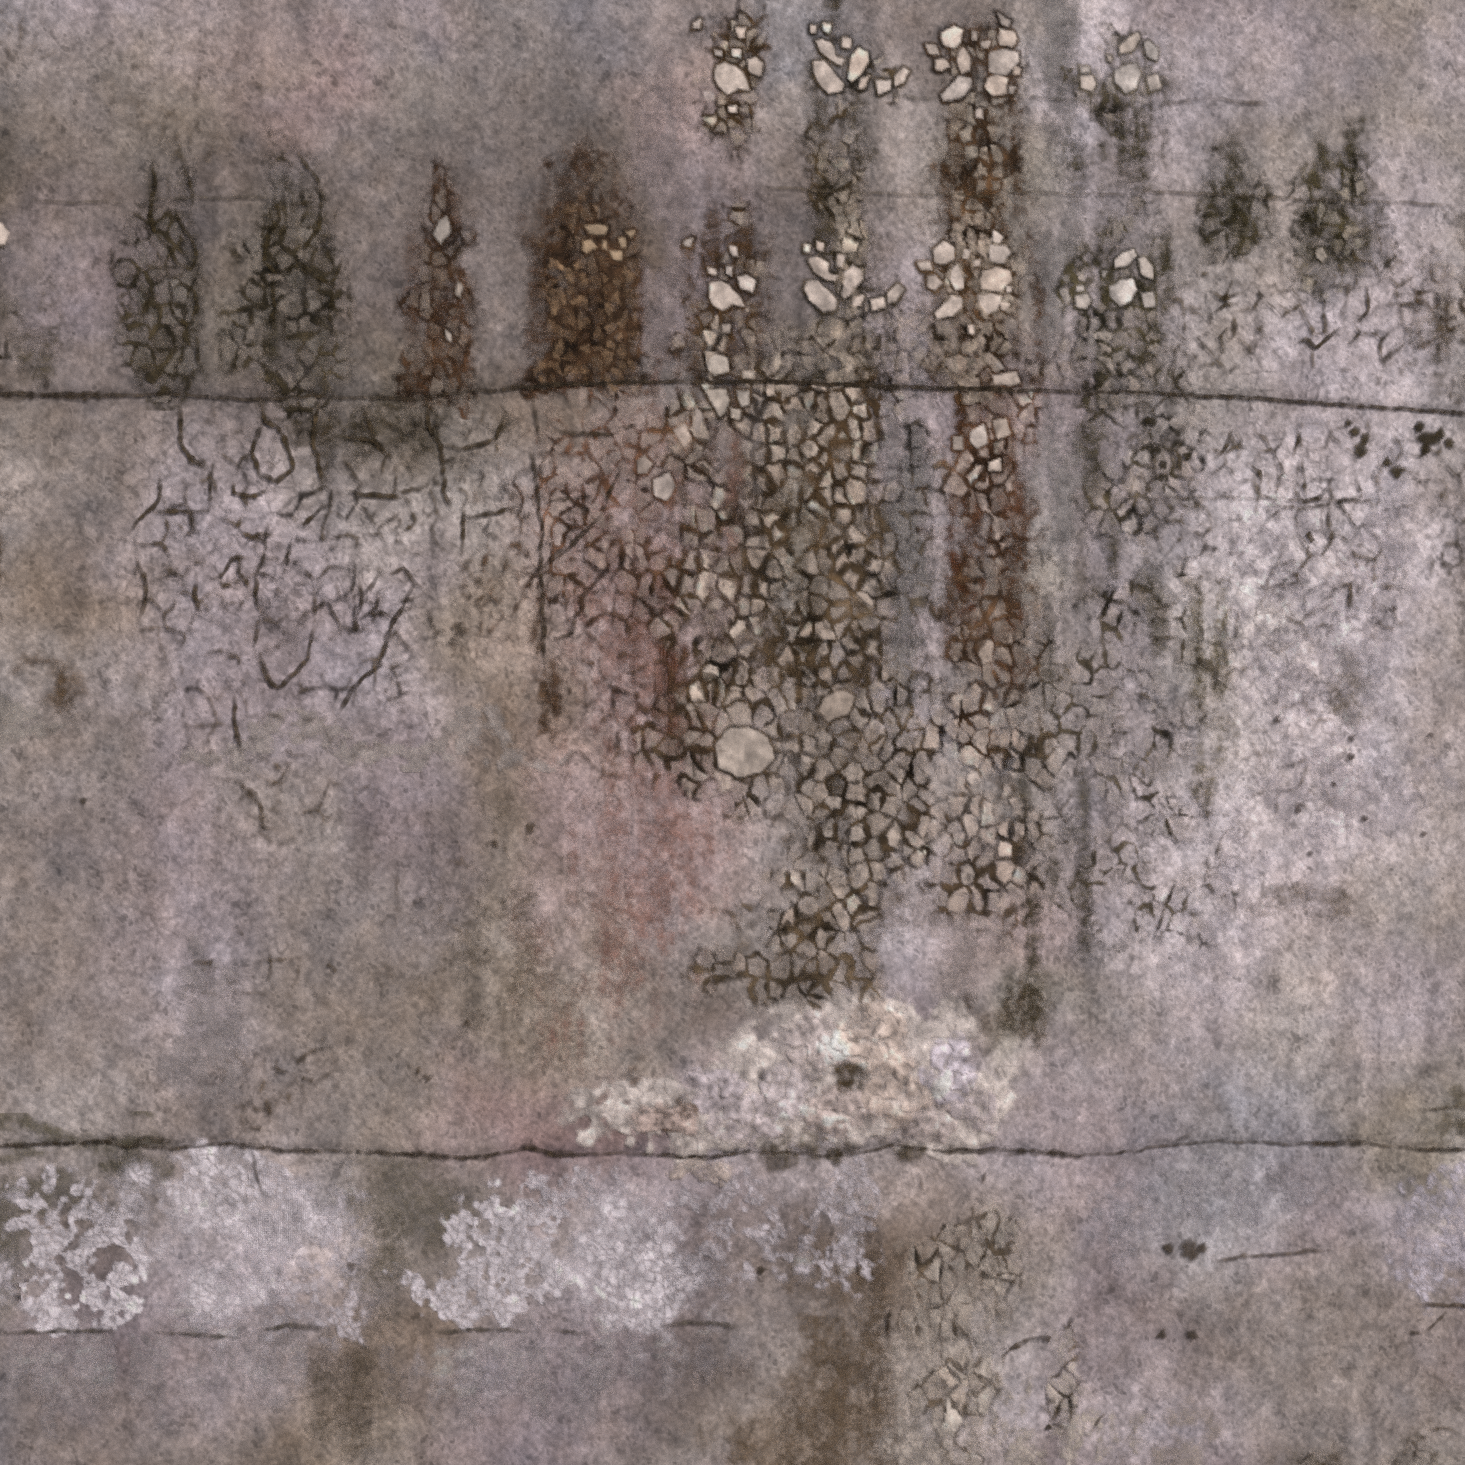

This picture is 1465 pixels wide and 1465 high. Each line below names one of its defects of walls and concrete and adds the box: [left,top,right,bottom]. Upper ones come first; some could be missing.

peeling [0,223,9,248]
corrosion [523,199,643,399]
crack [0,157,1465,780]
peeling [521,7,1206,1012]
peeling [1178,611,1215,672]
crack [231,763,283,825]
crack [0,1053,1463,1185]
leakage [0,1113,879,1421]
peeling [910,1212,1018,1336]
peeling [915,1358,991,1465]
crack [1011,1336,1051,1349]
peeling [1046,1322,1080,1430]